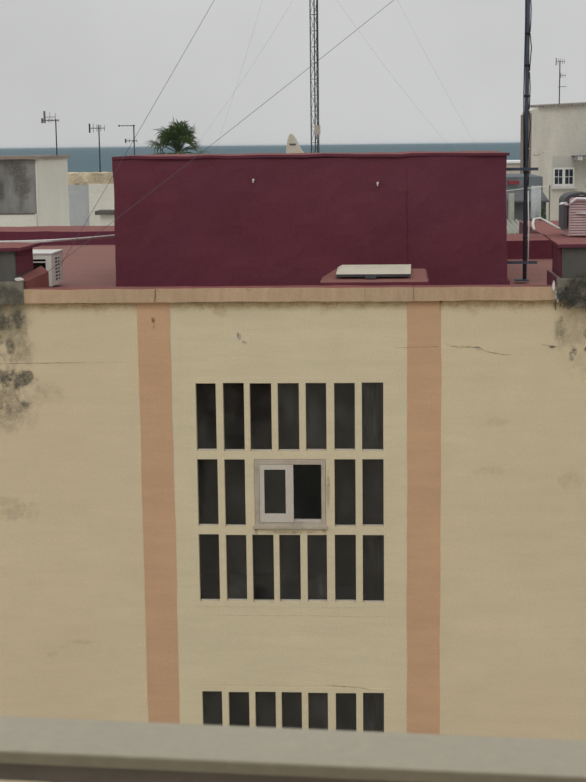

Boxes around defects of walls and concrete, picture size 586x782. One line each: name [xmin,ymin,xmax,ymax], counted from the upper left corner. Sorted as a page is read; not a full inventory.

mould [0,371,33,394]